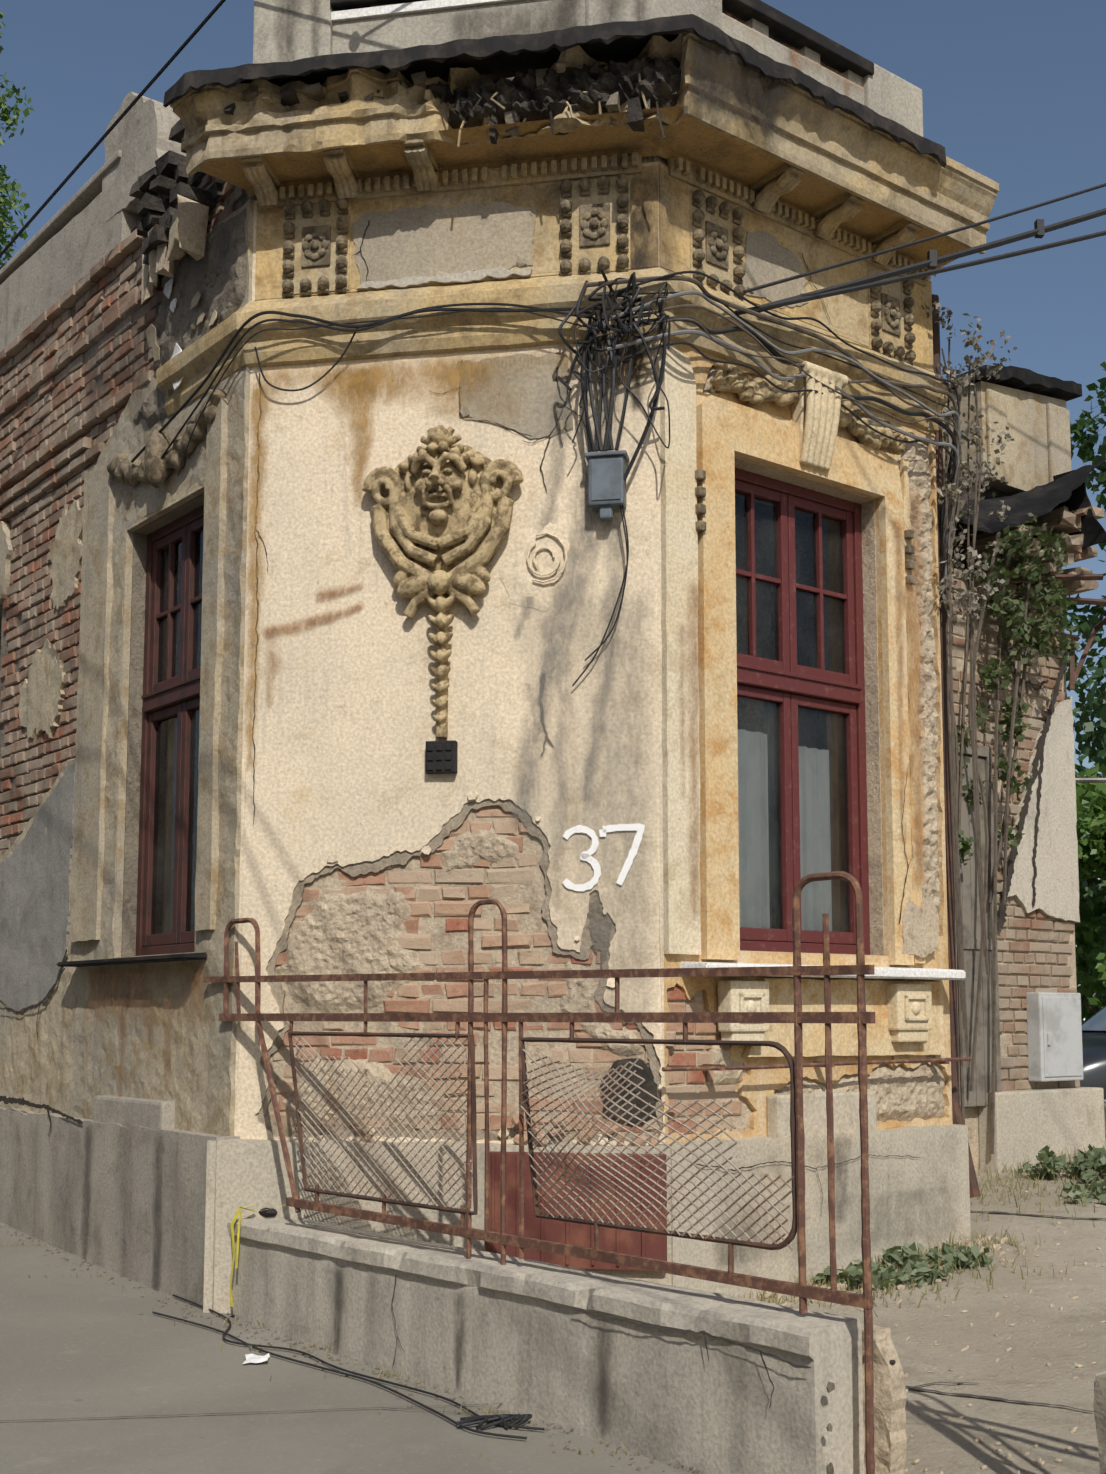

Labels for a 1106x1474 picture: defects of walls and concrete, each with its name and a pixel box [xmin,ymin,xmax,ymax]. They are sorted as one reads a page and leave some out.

spalling [223,57,681,147]
spalling [145,208,247,364]
spalling [133,377,183,428]
spalling [702,367,724,393]
spalling [901,435,941,958]
spalling [256,789,744,1147]
spalling [774,1055,945,1122]
crack [573,1308,812,1408]